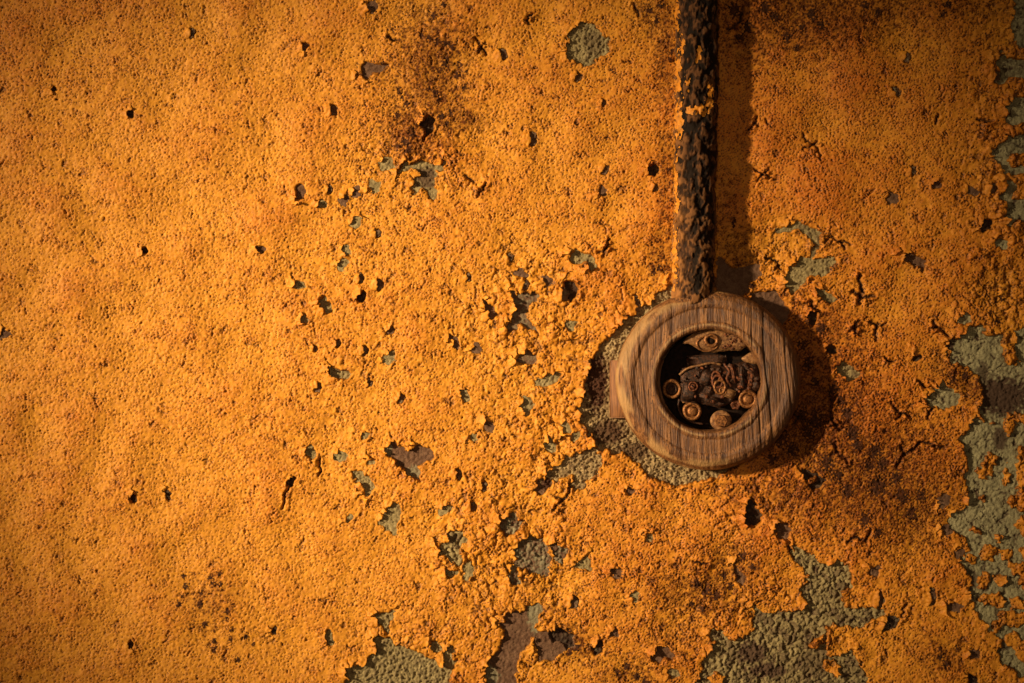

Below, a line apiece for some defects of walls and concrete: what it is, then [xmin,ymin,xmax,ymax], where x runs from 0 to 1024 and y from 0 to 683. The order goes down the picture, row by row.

peeling [551,13,611,67]
peeling [969,0,1024,250]
peeling [285,150,448,229]
peeling [474,247,597,373]
peeling [713,216,837,326]
spalling [514,271,737,495]
peeling [292,430,434,536]
peeling [336,598,457,683]
peeling [425,531,474,581]
peeling [475,509,622,683]
peeling [695,497,900,683]
peeling [914,308,1024,683]